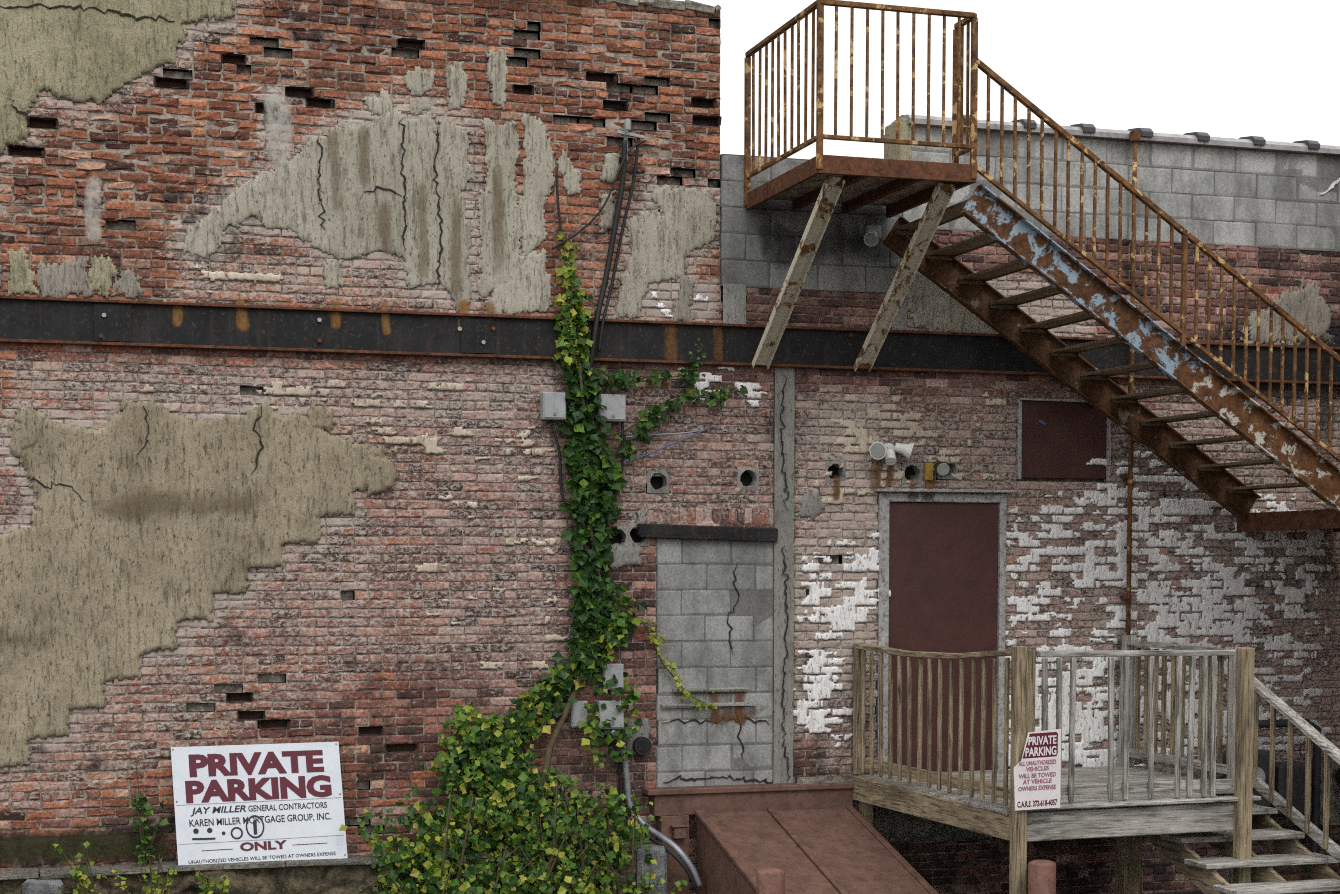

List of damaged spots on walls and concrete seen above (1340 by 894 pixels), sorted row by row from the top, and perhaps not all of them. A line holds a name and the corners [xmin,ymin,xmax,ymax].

crack [0,3,174,22]
flaking render [0,0,235,158]
flaking render [183,48,582,315]
corrosion [173,301,183,326]
corrosion [236,299,249,331]
corrosion [381,301,391,334]
crack [251,404,264,474]
crack [779,376,790,510]
corrosion [871,459,894,490]
flaking render [0,378,478,770]
crack [663,546,790,784]
peeling [1005,443,1334,767]